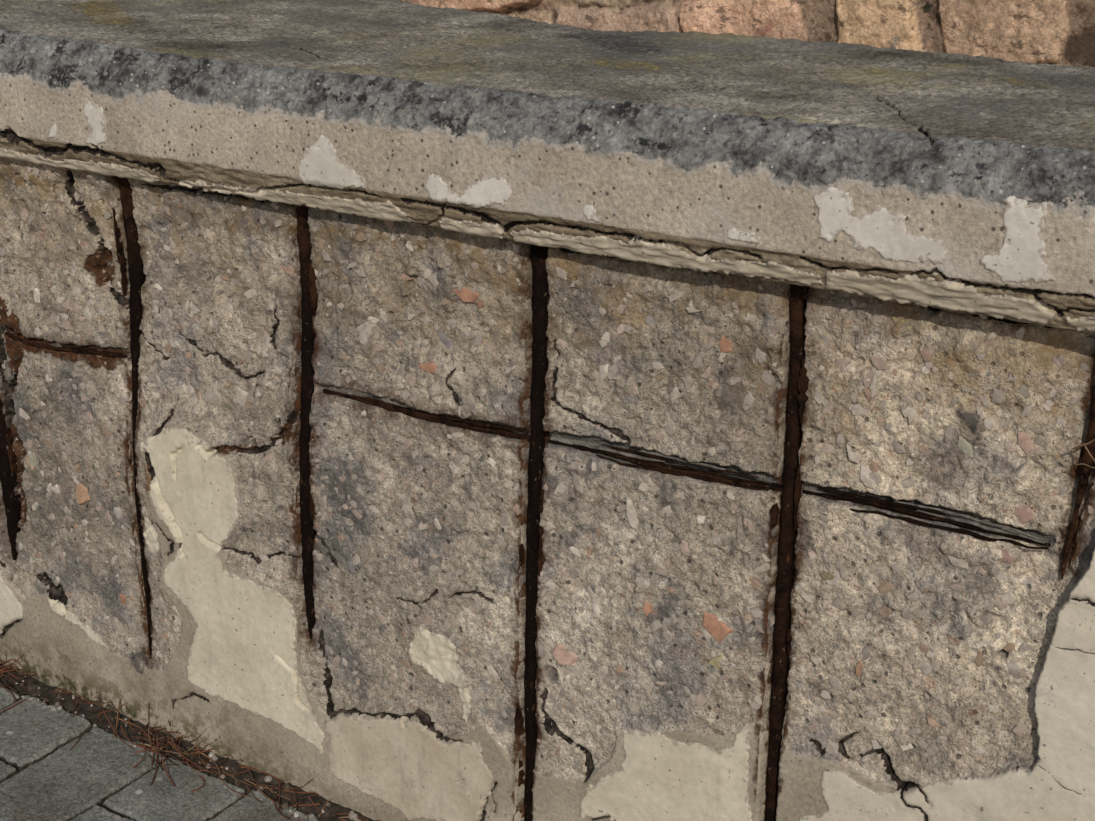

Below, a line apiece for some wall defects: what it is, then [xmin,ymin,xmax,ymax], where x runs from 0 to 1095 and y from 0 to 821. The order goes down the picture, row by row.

peeling [298,134,367,189]
crack [0,129,761,309]
peeling [812,187,948,264]
peeling [976,196,1055,287]
crack [800,256,1095,328]
corrosion [0,297,127,377]
crack [142,306,280,380]
crack [551,340,630,442]
crack [144,409,189,481]
spalling [0,148,823,821]
spalling [510,244,1095,821]
crack [809,732,929,821]